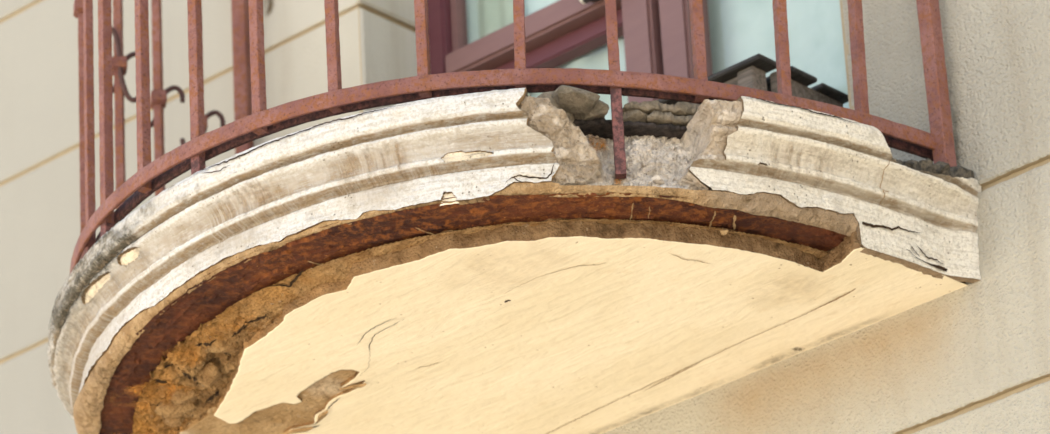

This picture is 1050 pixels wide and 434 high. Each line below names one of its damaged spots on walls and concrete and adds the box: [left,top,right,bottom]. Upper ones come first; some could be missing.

spalling [73,96,858,434]
crack [862,161,948,272]
crack [357,319,402,371]
crack [547,289,855,434]